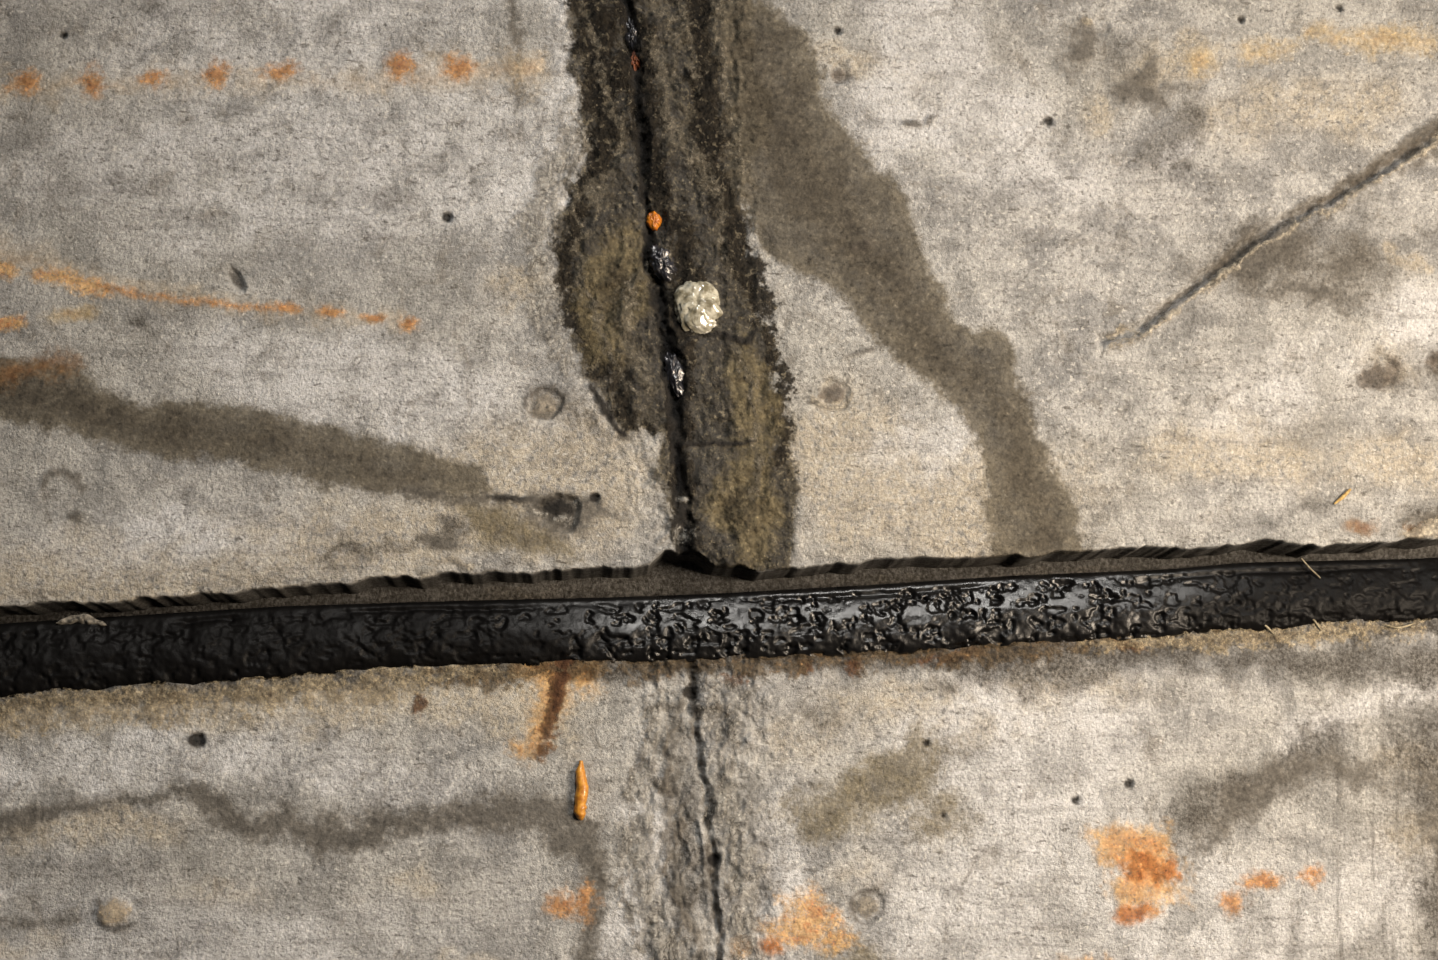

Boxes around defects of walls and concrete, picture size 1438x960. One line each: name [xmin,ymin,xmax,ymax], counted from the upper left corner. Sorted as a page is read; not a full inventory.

corrosion [388,54,416,79]
corrosion [446,56,471,78]
crack [620,0,758,555]
leakage [508,0,1085,571]
crack [1107,115,1438,348]
leakage [0,357,507,505]
crack [588,383,629,440]
crack [488,493,562,503]
leakage [419,532,475,576]
corrosion [513,660,589,762]
corrosion [738,893,847,953]
corrosion [1098,827,1181,924]